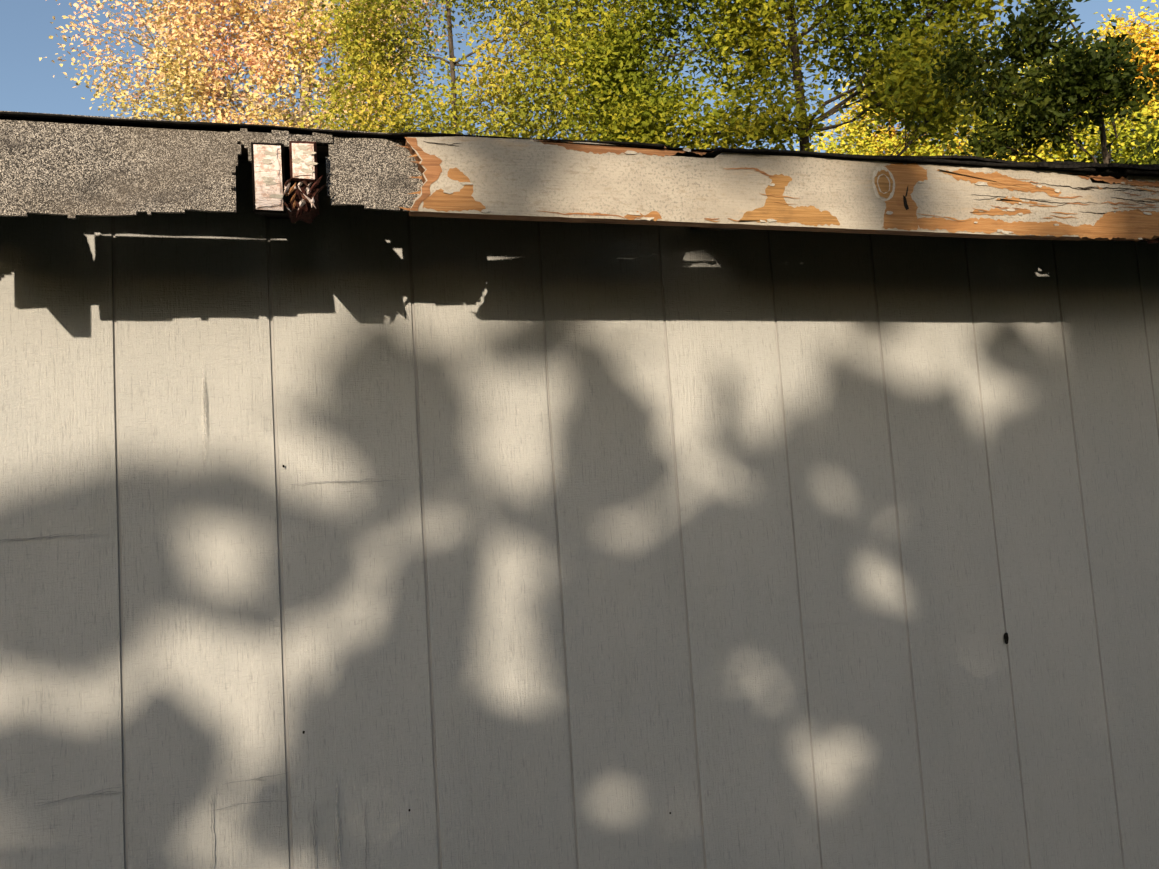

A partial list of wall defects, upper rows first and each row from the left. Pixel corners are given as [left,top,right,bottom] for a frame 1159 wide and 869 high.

peeling [534,140,713,157]
peeling [423,167,490,213]
peeling [624,211,662,221]
peeling [704,174,840,227]
peeling [882,163,1159,240]